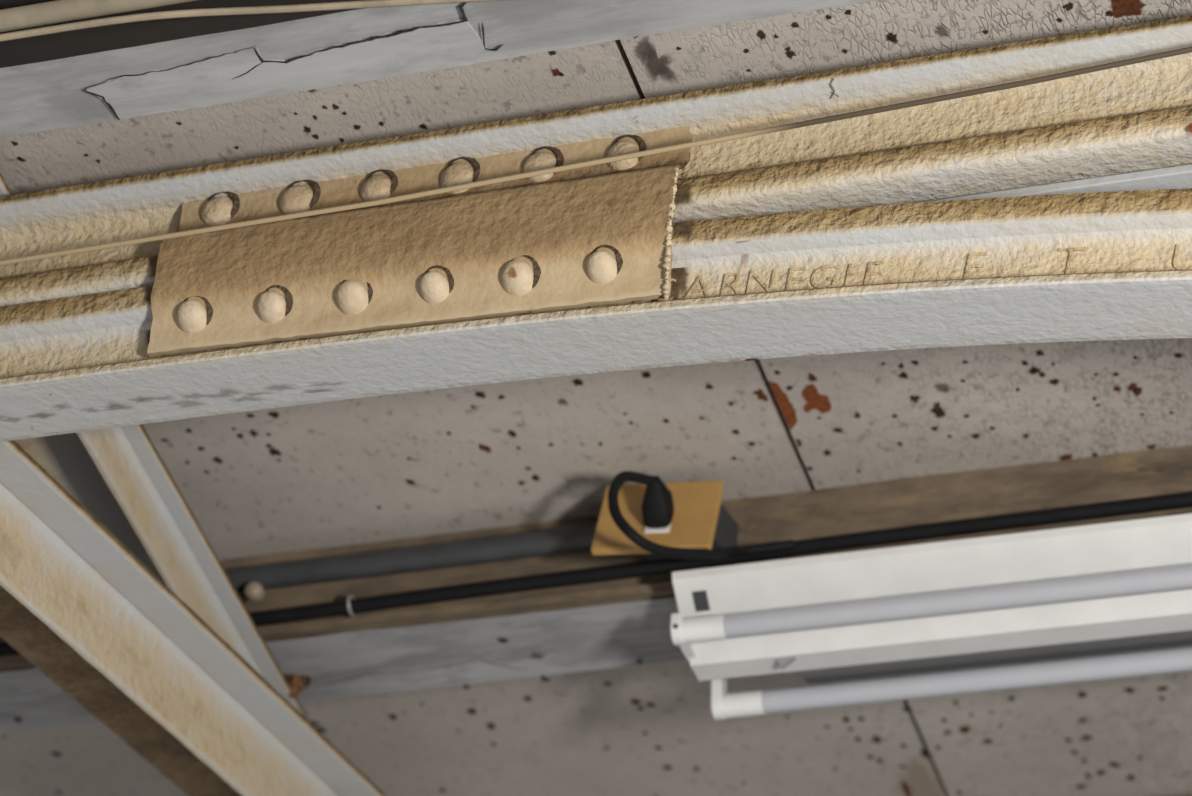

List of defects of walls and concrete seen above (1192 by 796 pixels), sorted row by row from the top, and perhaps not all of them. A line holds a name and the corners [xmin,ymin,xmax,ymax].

rust [1112,0,1146,18]
peeling [86,20,486,125]
peeling [294,104,361,139]
rust [754,373,831,447]